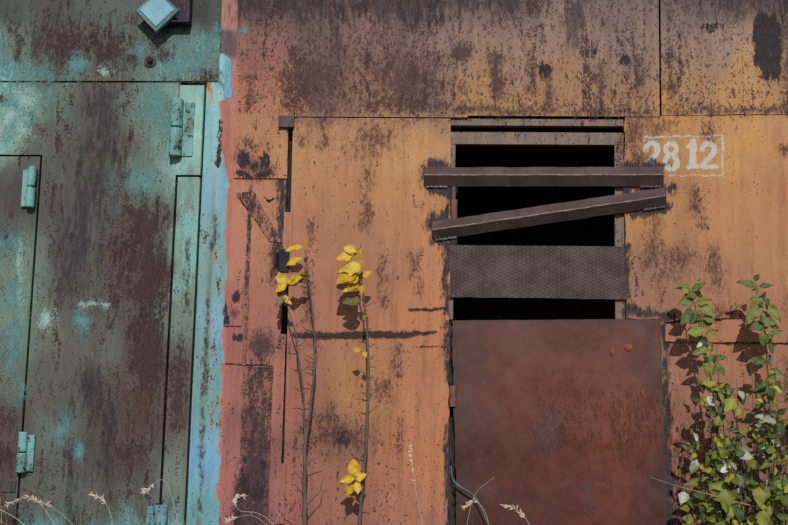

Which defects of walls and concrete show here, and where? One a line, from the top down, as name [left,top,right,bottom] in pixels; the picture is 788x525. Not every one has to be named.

peeling [0,37,57,153]
corrosion [8,22,146,78]
peeling [65,51,110,80]
corrosion [359,41,555,117]
corrosion [572,46,652,166]
corrosion [655,51,788,141]
peeling [0,232,27,309]
peeling [37,307,59,334]
peeling [72,299,108,341]
corrosion [223,290,242,324]
corrosion [232,329,275,360]
peeling [51,413,87,461]